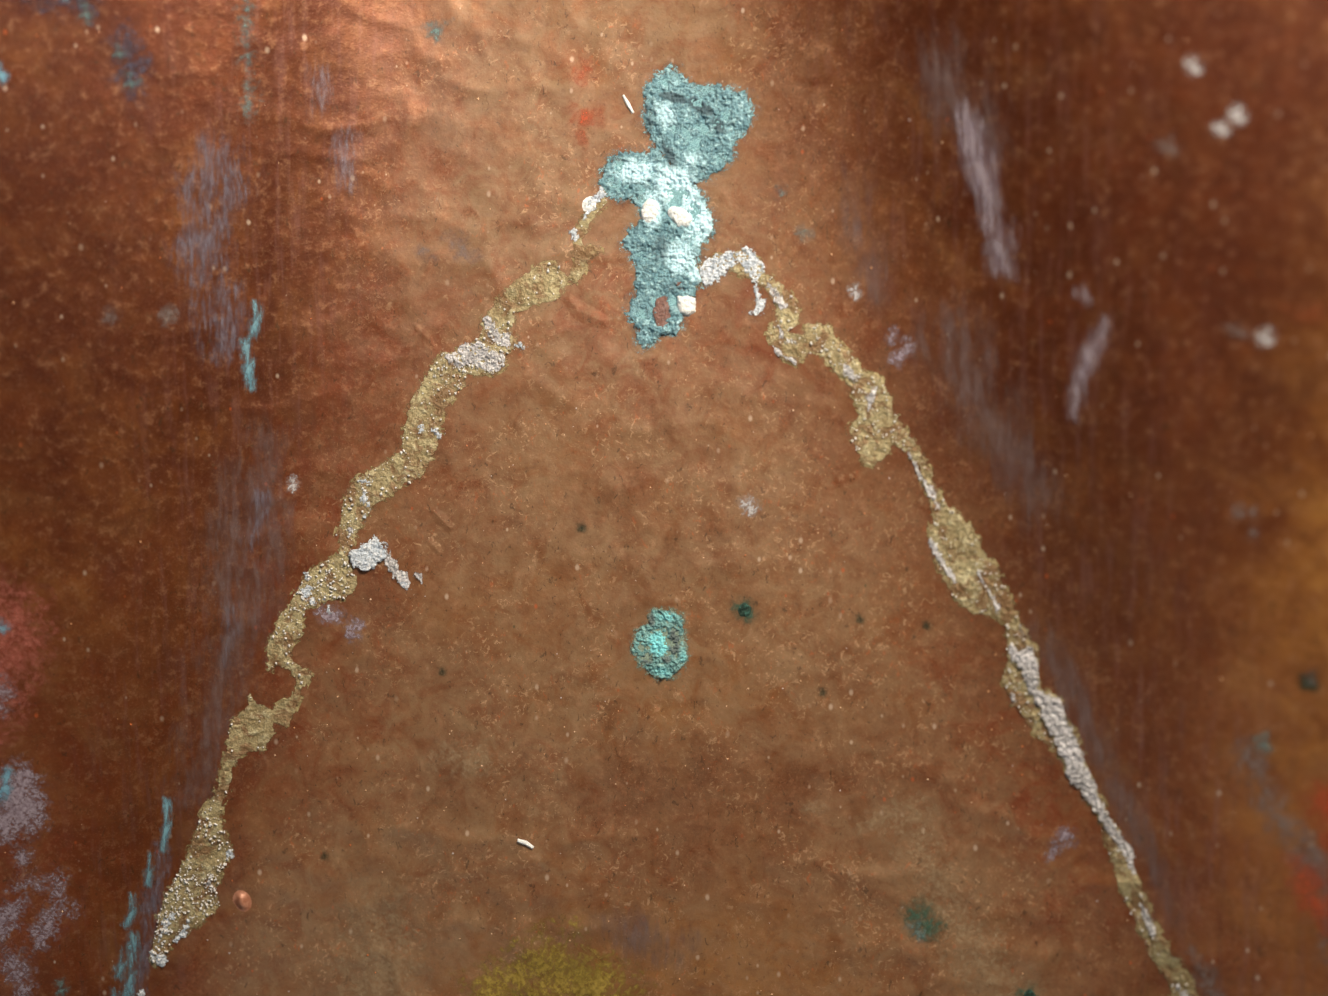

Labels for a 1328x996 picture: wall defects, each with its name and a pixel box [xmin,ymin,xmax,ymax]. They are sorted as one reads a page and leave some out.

water stain [652,281,688,327]